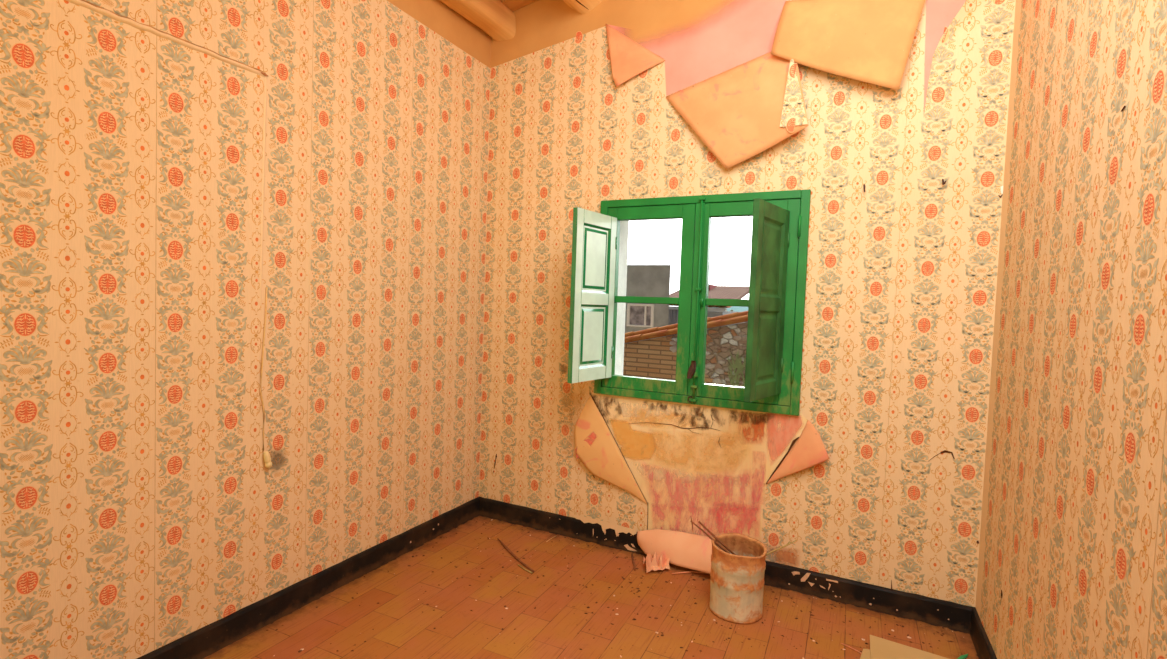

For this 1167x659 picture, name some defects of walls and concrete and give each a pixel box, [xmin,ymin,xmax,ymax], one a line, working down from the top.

peeling [606,0,1016,169]
leakage [593,396,802,535]
peeling [574,393,830,574]